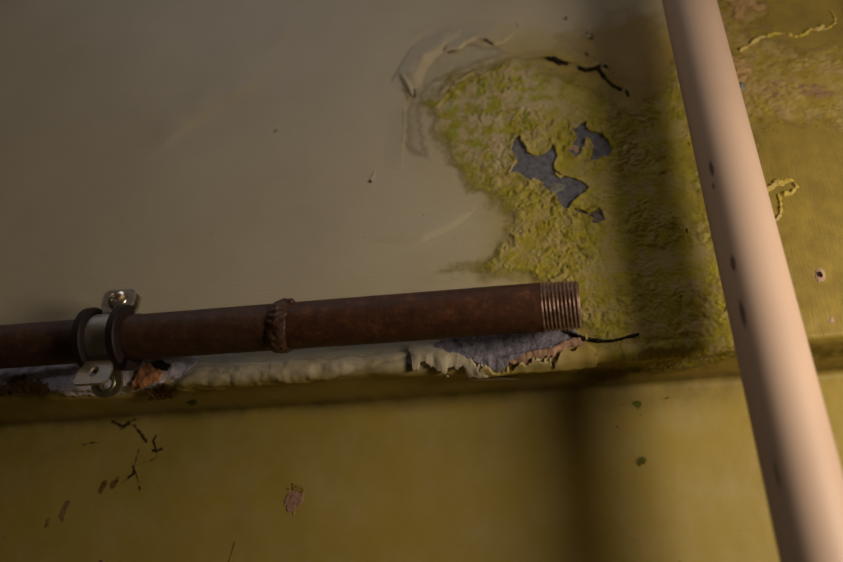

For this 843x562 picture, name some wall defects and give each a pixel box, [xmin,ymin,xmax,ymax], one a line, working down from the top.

damp [717,0,843,150]
peeling [567,122,612,160]
peeling [511,137,605,223]
damp [424,17,736,372]
spalling [0,364,95,397]
spalling [117,356,198,401]
spalling [407,329,598,381]
crack [564,329,639,343]
crack [112,419,163,491]